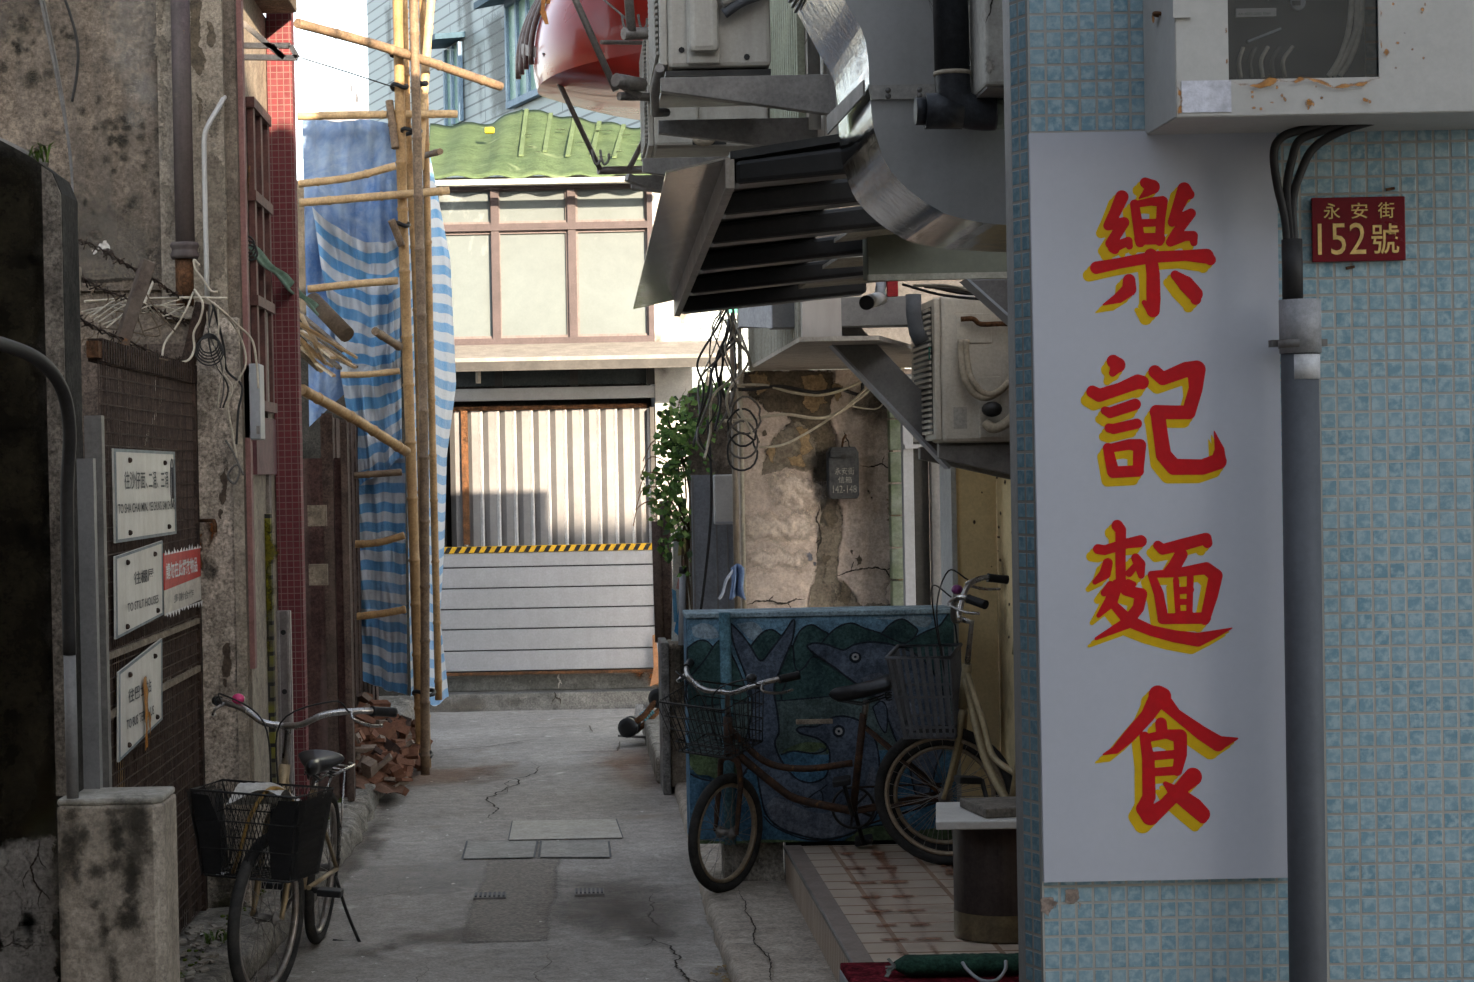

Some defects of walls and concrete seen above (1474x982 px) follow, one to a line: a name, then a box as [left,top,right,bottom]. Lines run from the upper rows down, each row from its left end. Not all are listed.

damp [0,17,73,92]
corrosion [1250,77,1371,110]
damp [79,98,159,192]
flaking render [743,370,891,607]
damp [0,146,156,982]
crack [444,674,620,819]
crack [637,894,698,982]
crack [738,889,773,981]